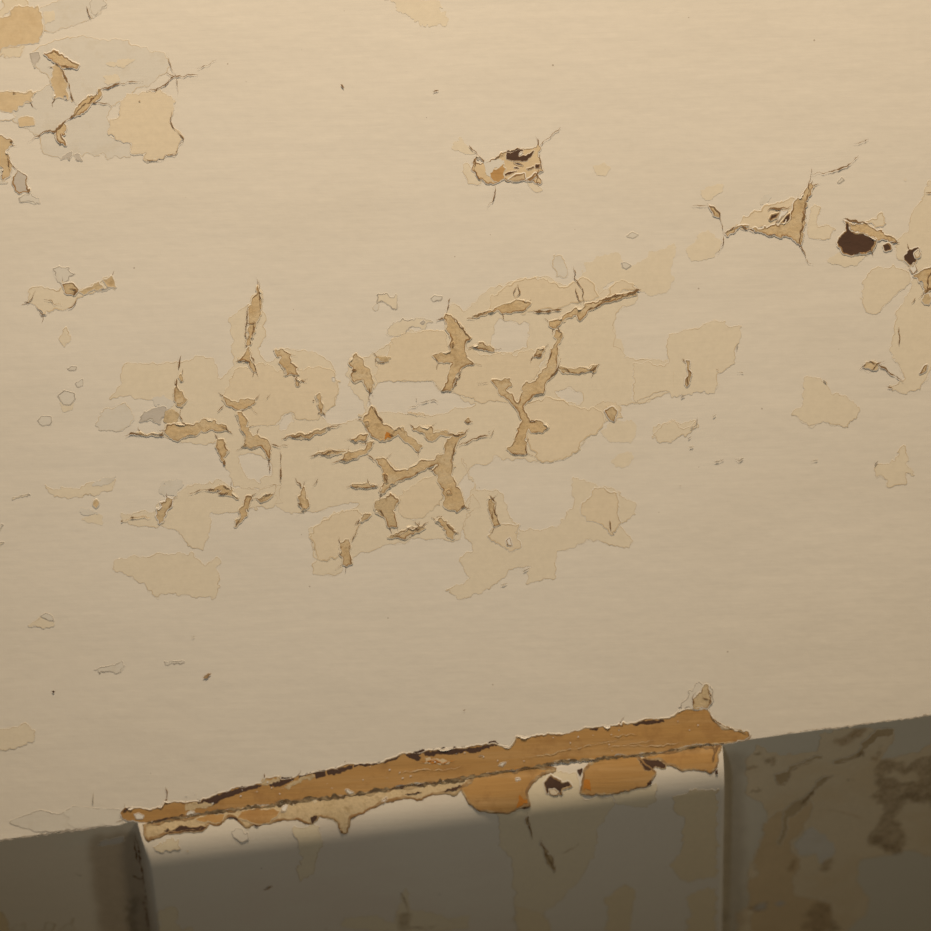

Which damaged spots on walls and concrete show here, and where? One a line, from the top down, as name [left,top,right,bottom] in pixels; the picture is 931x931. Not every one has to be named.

peeling [0,0,184,163]
peeling [0,134,41,205]
peeling [452,128,560,203]
peeling [22,265,117,316]
peeling [739,180,931,395]
peeling [109,243,742,600]
peeling [9,681,931,931]